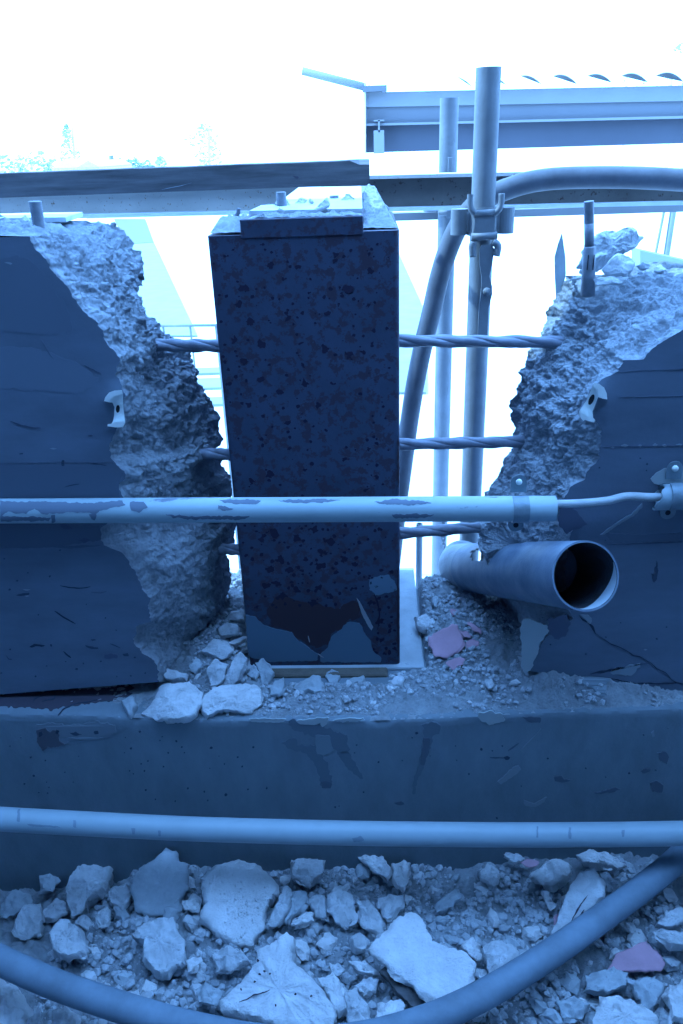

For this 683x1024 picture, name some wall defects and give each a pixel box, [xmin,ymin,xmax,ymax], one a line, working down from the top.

spalling [0,214,232,498]
spalling [484,261,683,592]
spalling [100,523,236,682]
peeling [245,615,381,663]
peeling [369,575,397,595]
spalling [500,597,592,674]
crack [579,615,683,685]